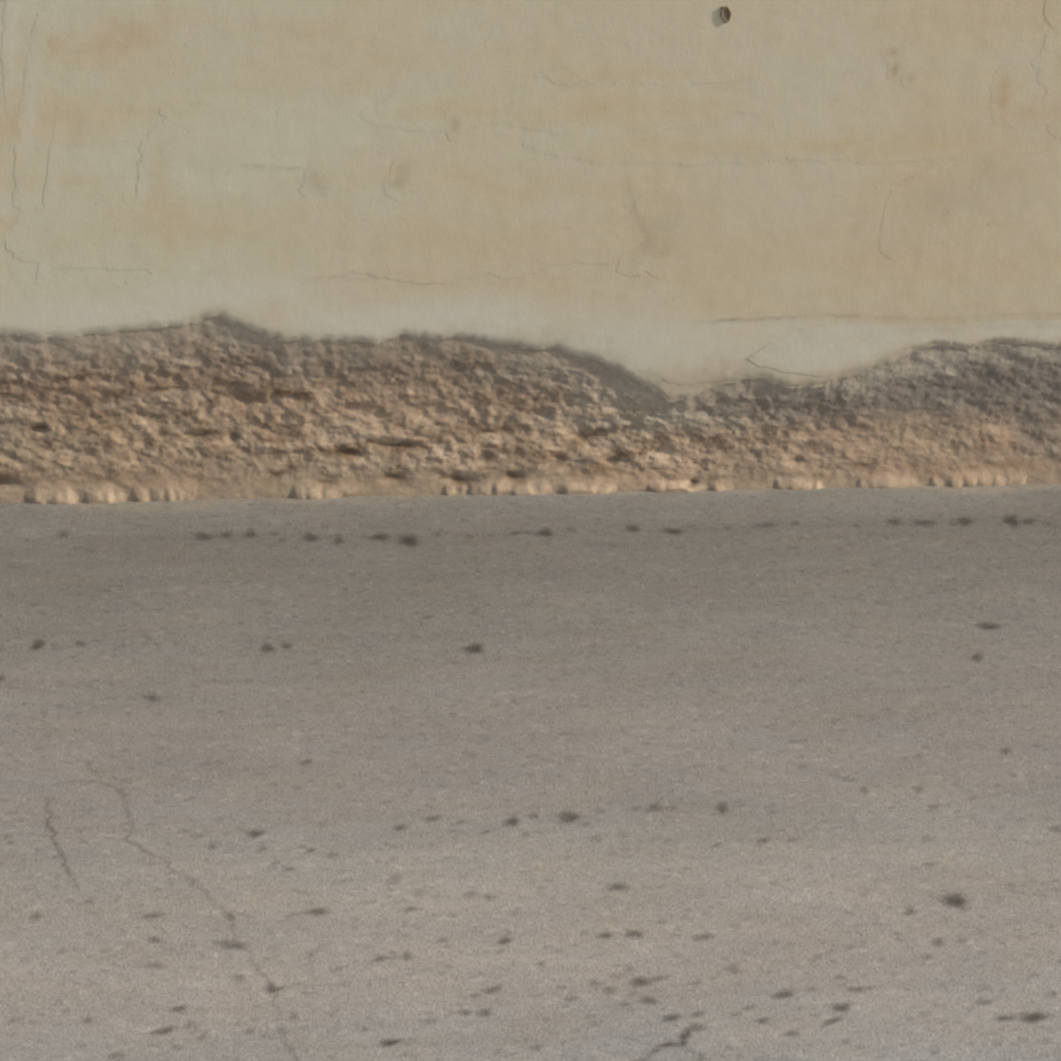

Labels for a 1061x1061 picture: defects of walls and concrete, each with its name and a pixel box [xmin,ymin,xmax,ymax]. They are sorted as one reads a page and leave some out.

spalling [0,317,1061,504]